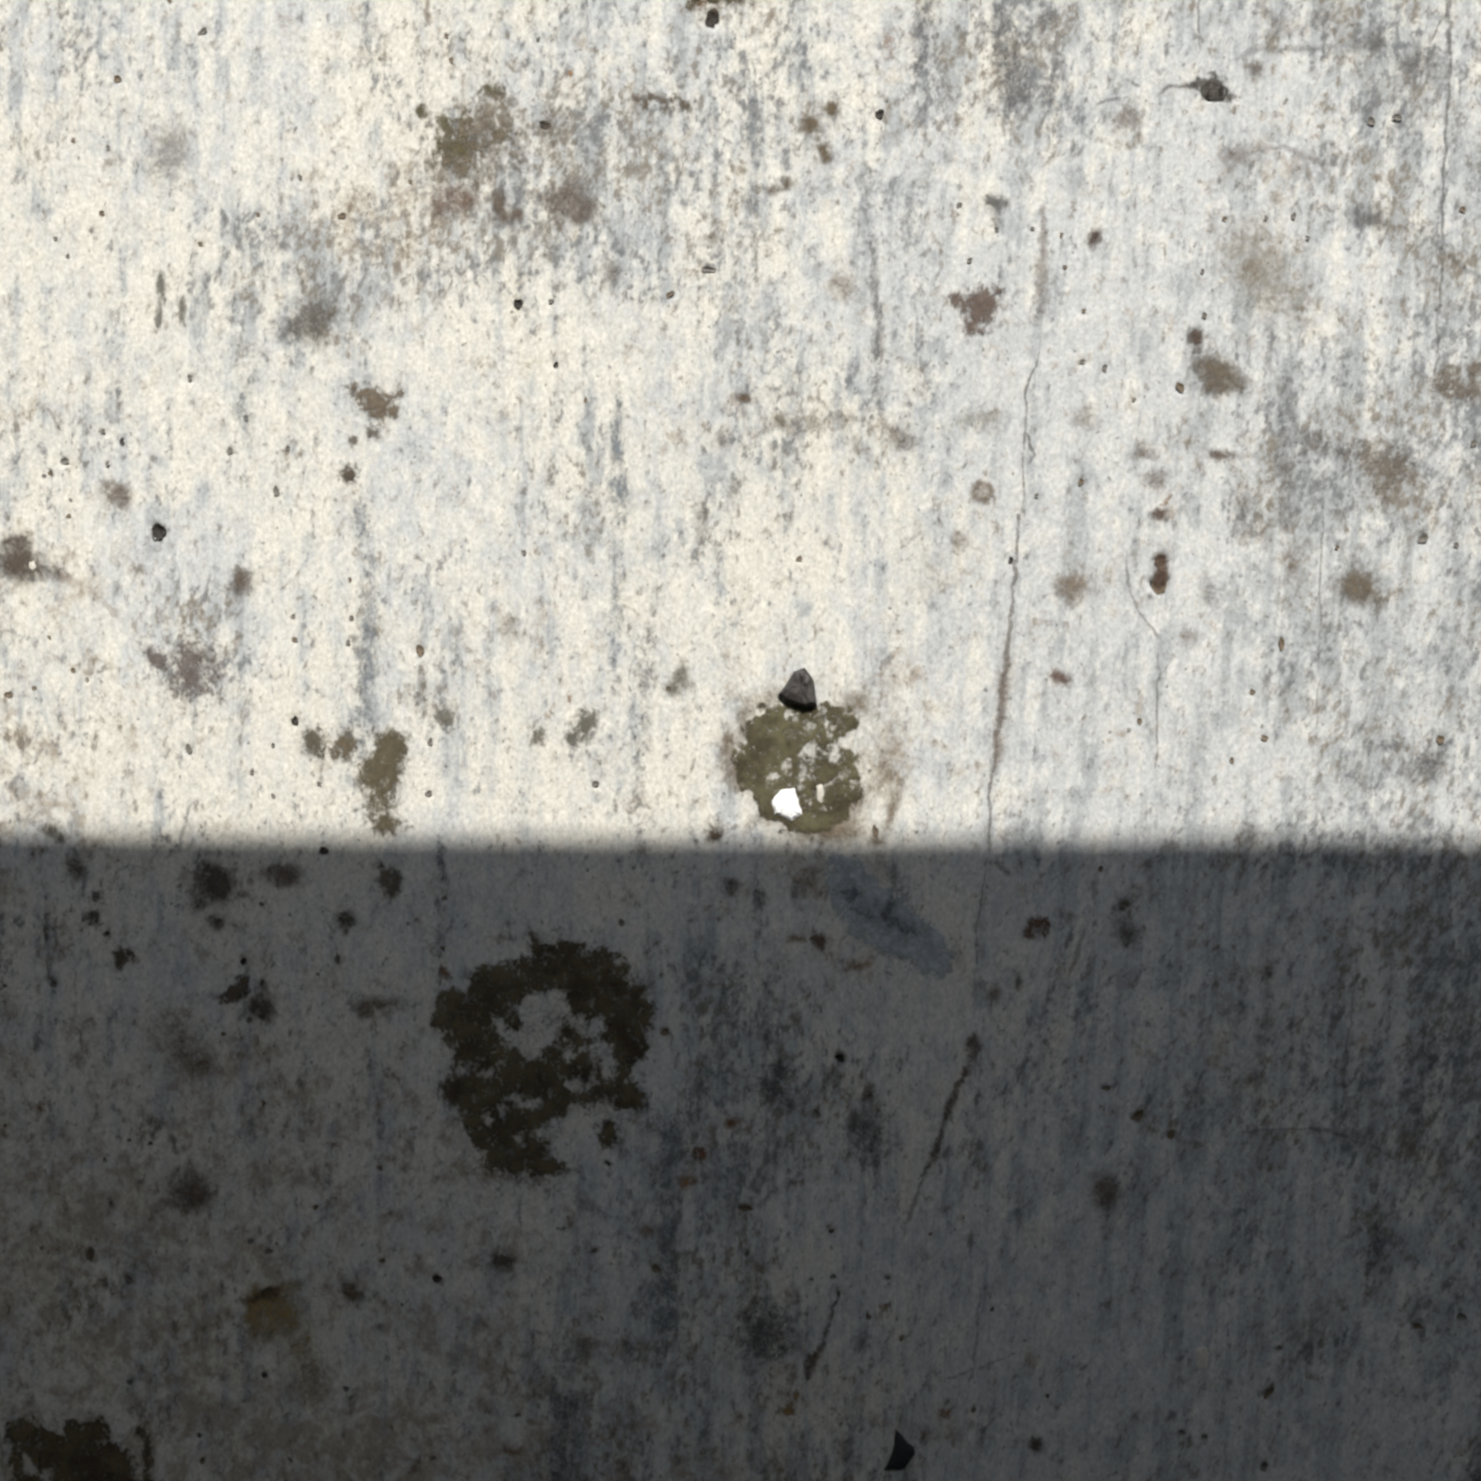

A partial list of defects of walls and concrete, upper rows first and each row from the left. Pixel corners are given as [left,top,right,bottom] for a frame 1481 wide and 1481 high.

water stain [424,92,572,221]
water stain [546,182,597,220]
water stain [303,621,413,836]
water stain [802,750,903,844]
crack [921,1033,980,1176]
crack [804,1296,839,1380]